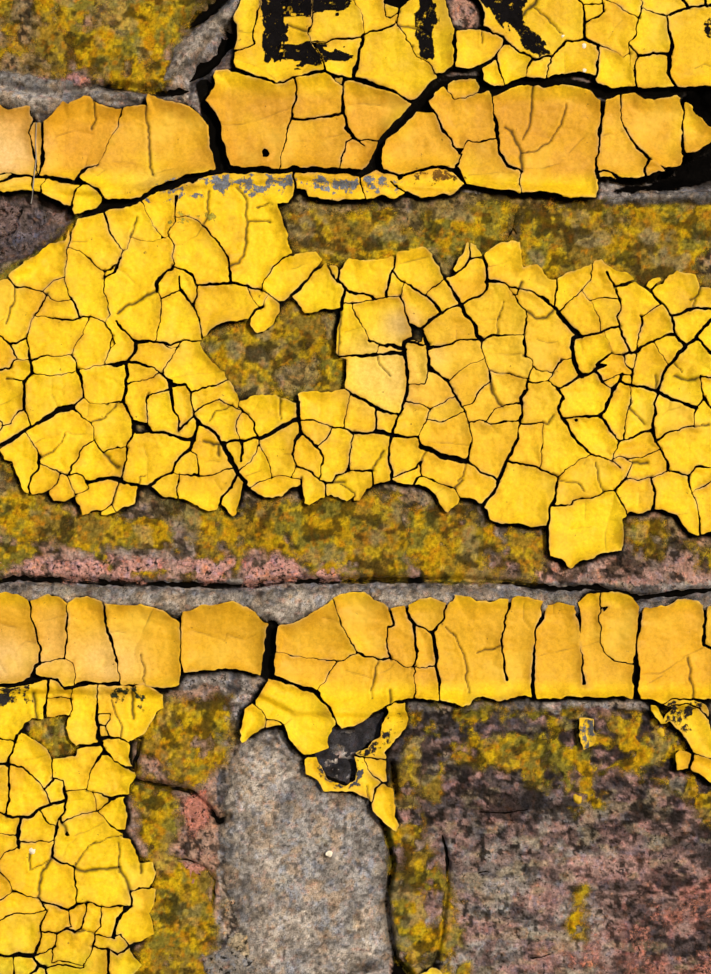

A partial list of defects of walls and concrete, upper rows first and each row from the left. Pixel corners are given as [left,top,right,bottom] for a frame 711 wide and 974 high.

crack [0,0,711,519]
peeling [0,0,711,569]
crack [0,890,134,974]
crack [178,858,216,904]
crack [0,575,711,868]
peeling [0,591,711,974]